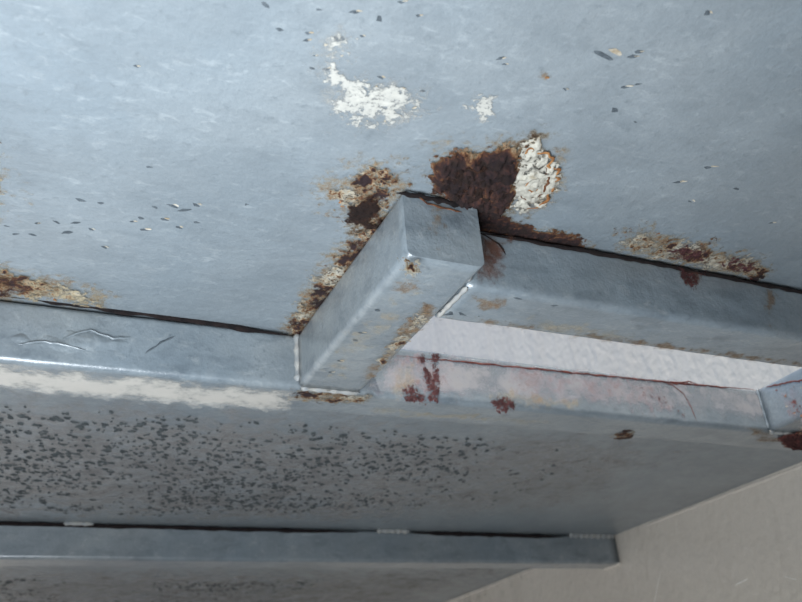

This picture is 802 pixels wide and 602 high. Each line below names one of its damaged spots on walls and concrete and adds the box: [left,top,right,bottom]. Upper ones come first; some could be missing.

peeling [309,34,430,130]
peeling [463,94,496,124]
peeling [510,131,565,219]
rust [425,135,595,276]
rust [281,162,412,336]
rust [613,221,771,291]
rust [0,264,107,308]
rust [491,396,516,414]
rust [402,353,753,406]
rust [609,430,635,440]
rust [753,429,802,451]